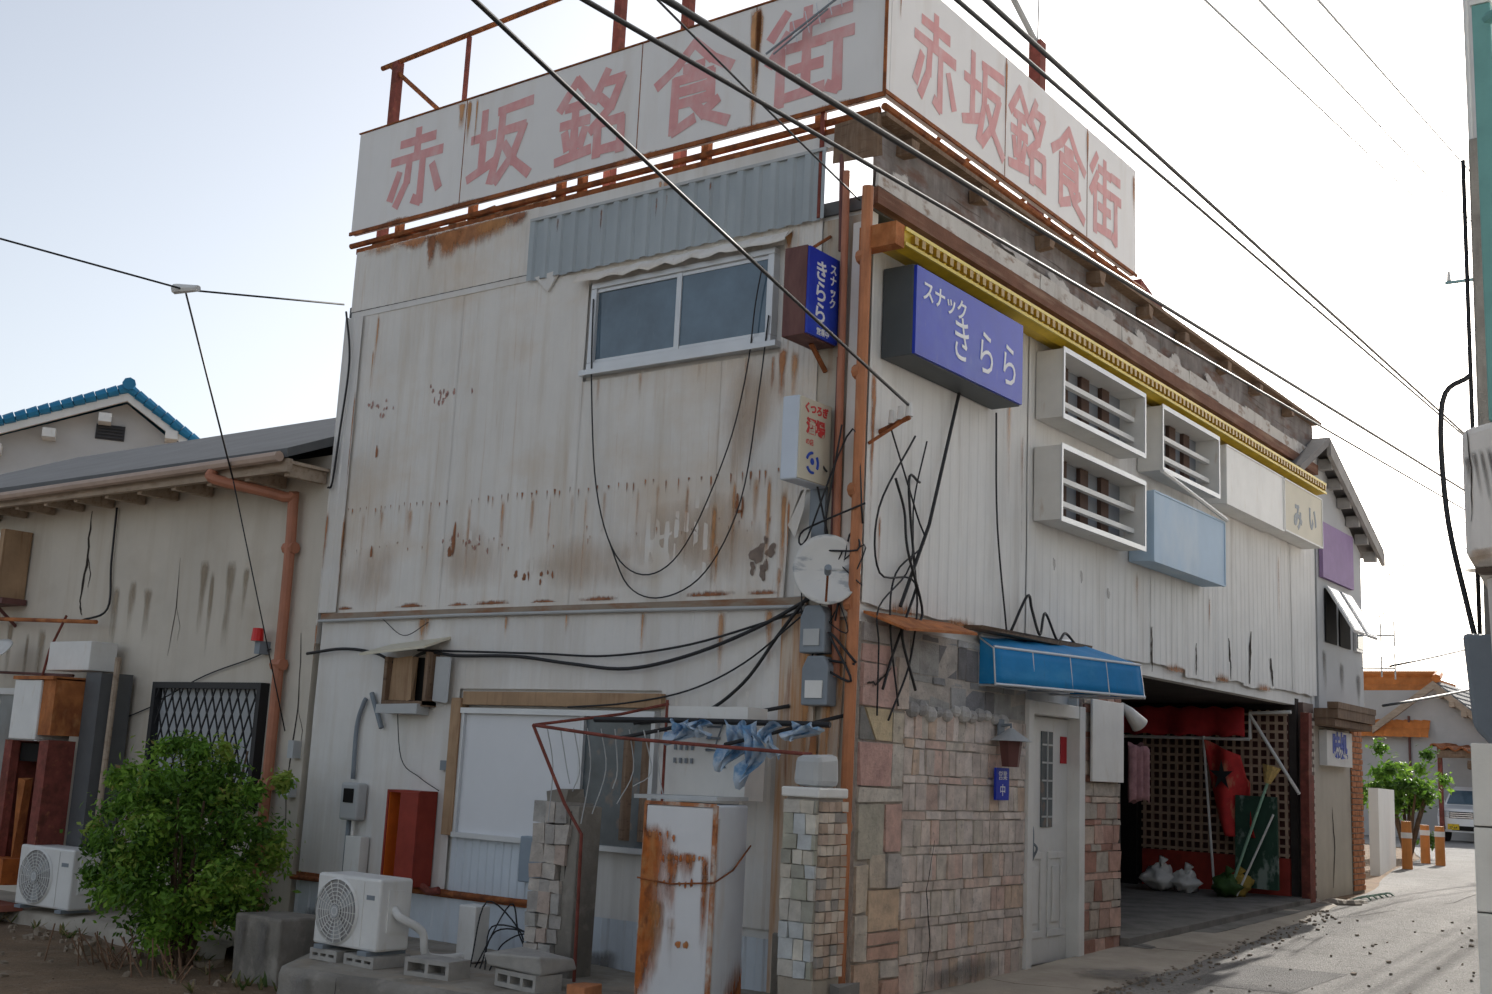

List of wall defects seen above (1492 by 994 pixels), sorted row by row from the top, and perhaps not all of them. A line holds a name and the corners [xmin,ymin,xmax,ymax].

rust [376,211,527,264]
rust [323,500,447,557]
rust [471,468,790,570]
rust [514,570,553,603]
rust [448,601,507,629]